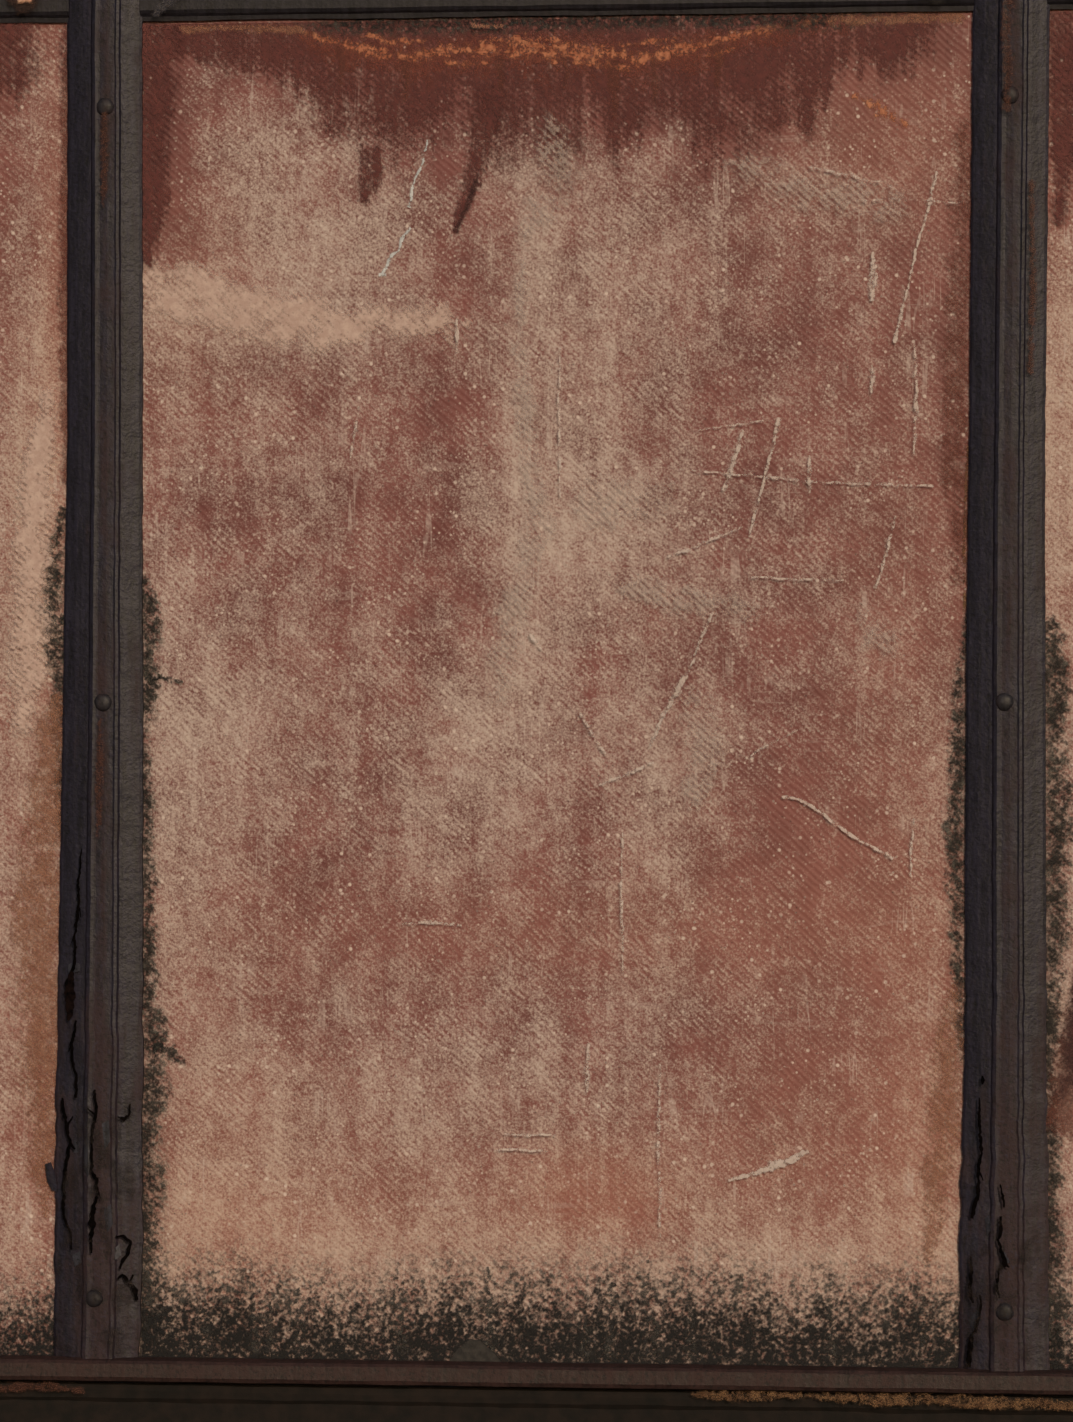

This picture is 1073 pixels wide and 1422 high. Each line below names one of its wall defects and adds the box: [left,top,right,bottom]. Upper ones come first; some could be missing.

corrosion [142,12,965,267]
crack [70,849,82,972]
water stain [139,576,960,1368]
water stain [942,617,967,1061]
water stain [1045,615,1073,1370]
crack [61,1020,138,1300]
crack [966,1076,1009,1368]